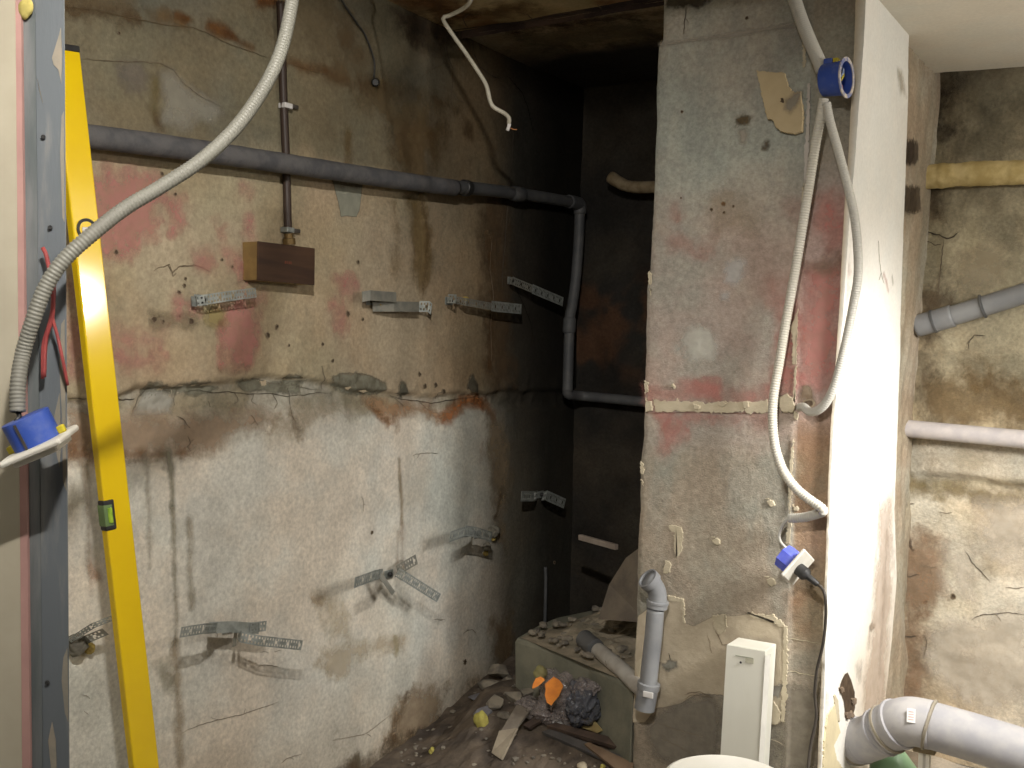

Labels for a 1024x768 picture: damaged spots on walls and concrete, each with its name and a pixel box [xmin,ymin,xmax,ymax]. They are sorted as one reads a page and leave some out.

crack [155,264,207,276]
damp [409,198,431,286]
flaking render [140,381,214,398]
crack [118,367,333,451]
flaking render [236,374,320,394]
flaking render [332,372,408,397]
corrosion [365,395,493,424]
damp [68,410,93,483]
damp [121,410,273,543]
peeling [747,611,857,768]